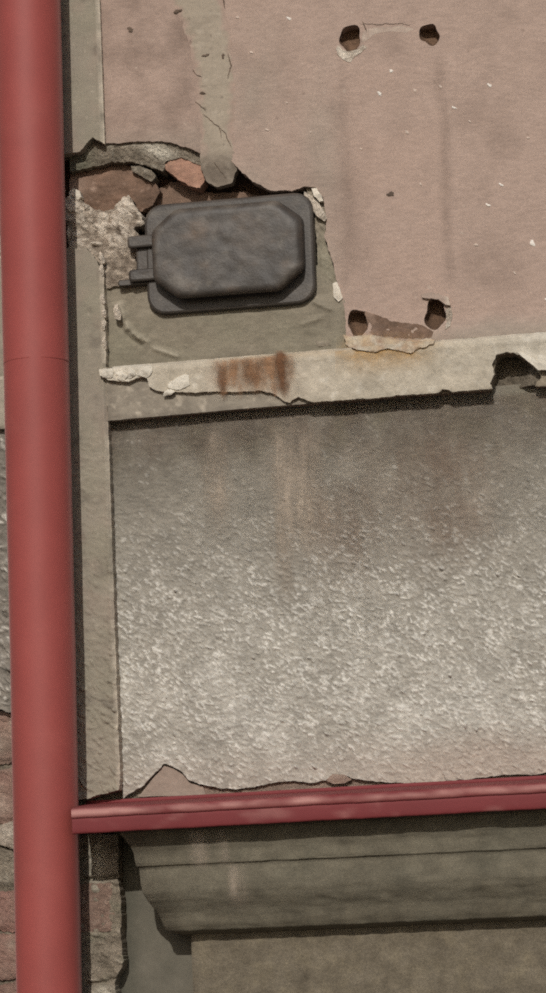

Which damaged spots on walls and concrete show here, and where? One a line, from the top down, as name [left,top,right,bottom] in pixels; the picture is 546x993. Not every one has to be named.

spalling [336,45,367,62]
spalling [65,140,258,351]
spalling [304,188,343,302]
spalling [315,311,435,353]
spalling [445,307,453,329]
rust [219,351,288,391]
spalling [495,351,546,388]
peeling [101,365,311,422]
spalling [138,766,400,797]
spalling [0,710,16,993]